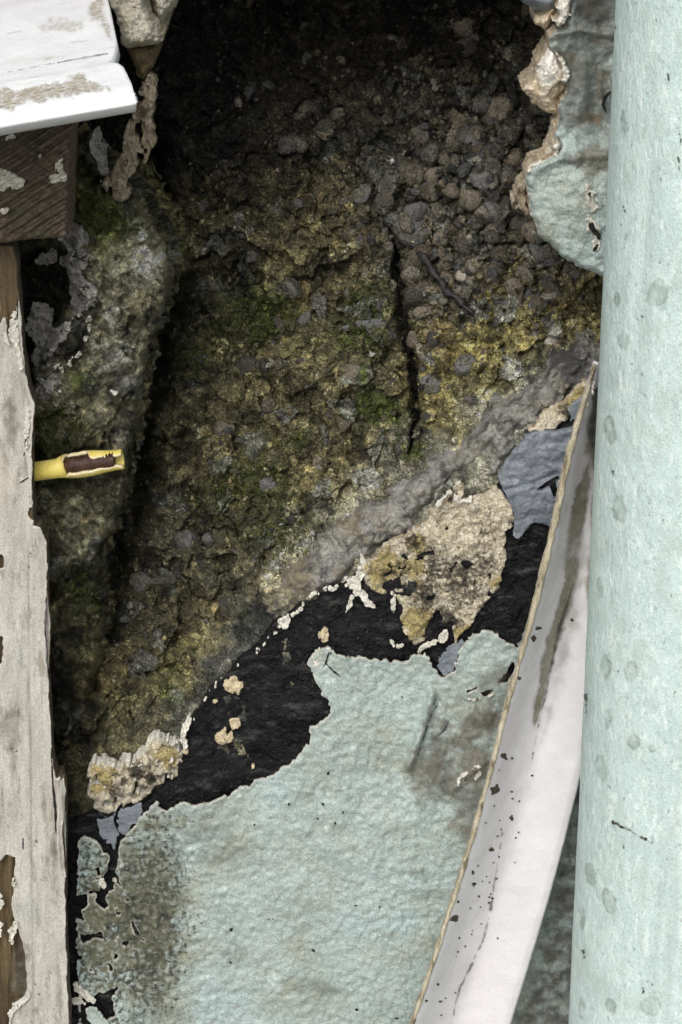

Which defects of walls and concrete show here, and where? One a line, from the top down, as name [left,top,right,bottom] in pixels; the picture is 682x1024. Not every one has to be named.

peeling [23,408,31,450]
peeling [3,221,98,401]
spalling [54,0,603,817]
crack [379,240,434,454]
leakage [534,388,616,726]
peeling [67,378,587,1024]
leakage [415,713,498,837]
peeling [0,877,19,945]
peeling [7,990,30,1024]
leakage [519,865,588,1024]